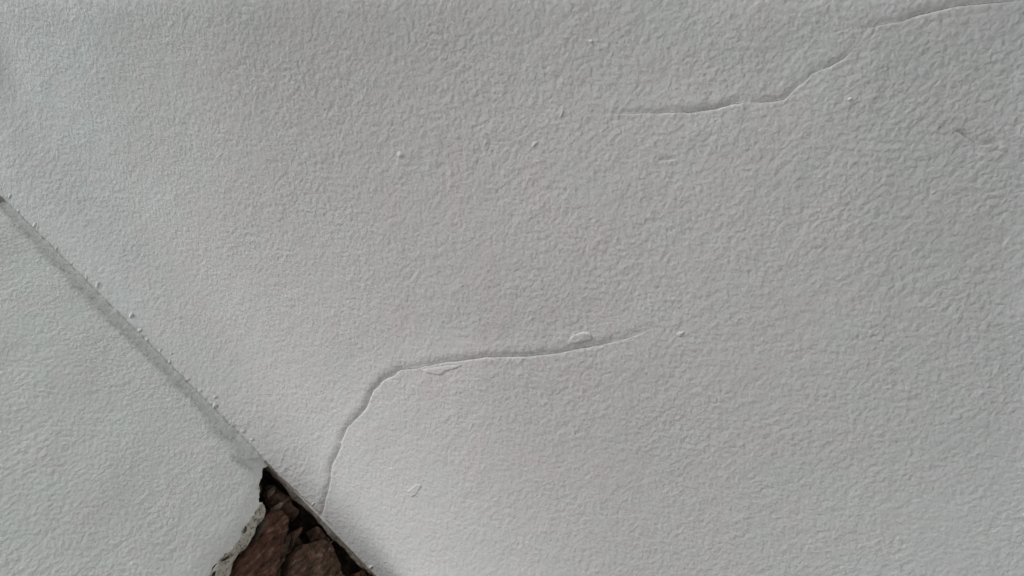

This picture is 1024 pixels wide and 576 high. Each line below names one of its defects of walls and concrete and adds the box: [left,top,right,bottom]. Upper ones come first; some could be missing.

crack [593,1,1024,122]
crack [0,187,262,461]
spalling [209,461,376,576]
crack [322,322,668,520]